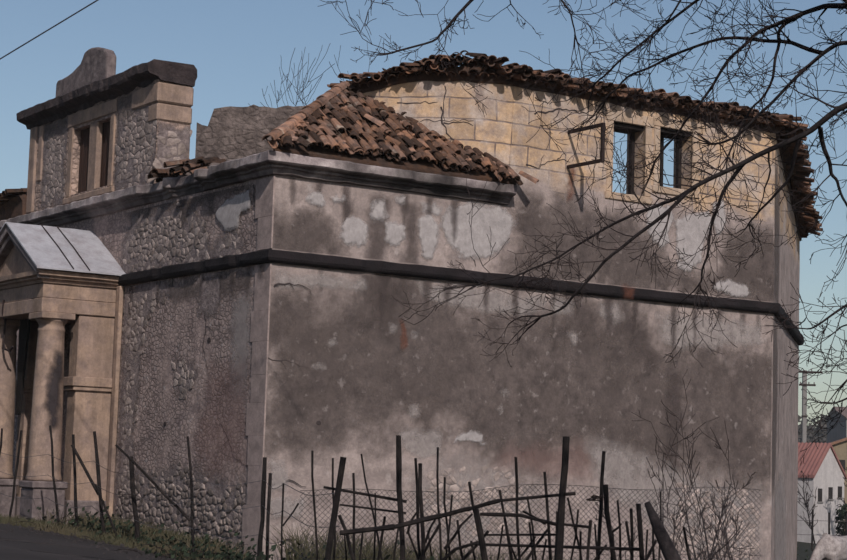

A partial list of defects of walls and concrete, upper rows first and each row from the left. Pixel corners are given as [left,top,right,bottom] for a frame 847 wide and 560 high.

peeling [216,190,250,230]
damp [273,212,338,255]
peeling [306,192,344,206]
peeling [341,201,406,247]
damp [371,199,386,259]
damp [402,195,417,263]
peeling [418,202,513,259]
damp [506,169,780,303]
peeling [715,279,749,297]
damp [45,352,63,428]
damp [265,275,778,491]